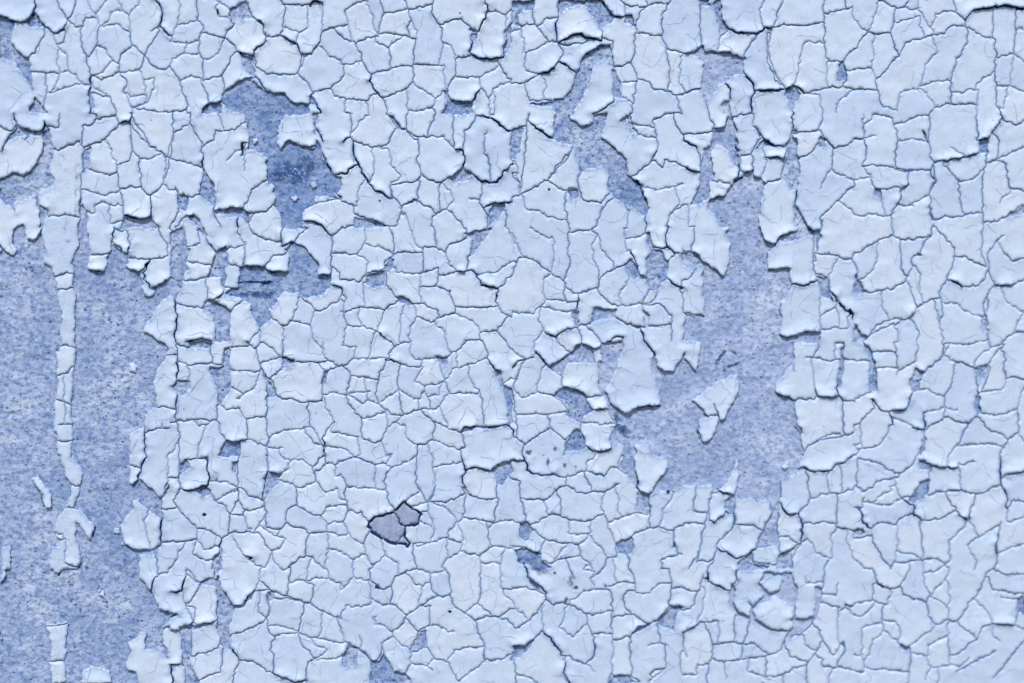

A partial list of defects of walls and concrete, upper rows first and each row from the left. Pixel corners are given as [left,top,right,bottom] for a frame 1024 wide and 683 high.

crack [673,105,715,148]
crack [734,163,749,184]
crack [761,151,785,224]
crack [0,195,79,256]
crack [128,231,168,289]
crack [180,271,271,310]
crack [213,205,308,268]
crack [154,301,225,384]
peeling [0,52,394,683]
peeling [467,0,878,663]
crack [131,420,170,486]
crack [126,627,184,683]